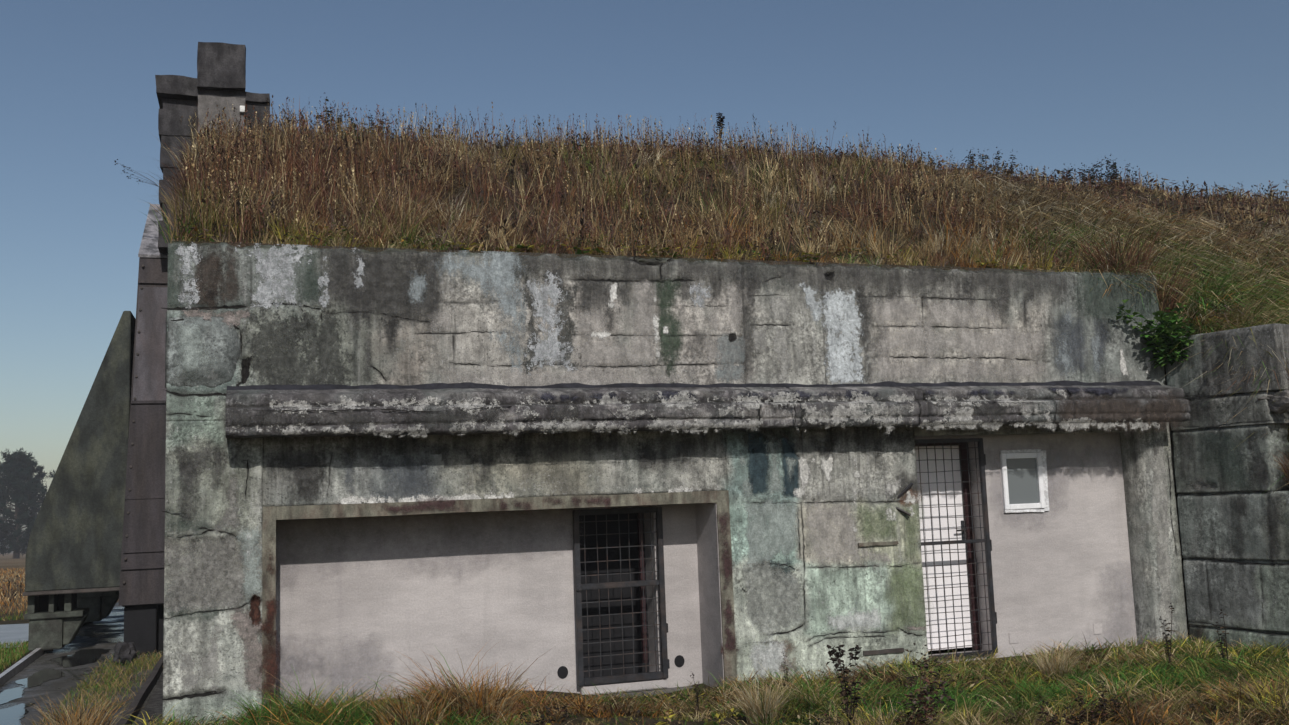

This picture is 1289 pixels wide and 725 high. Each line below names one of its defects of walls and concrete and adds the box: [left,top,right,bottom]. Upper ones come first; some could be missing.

water stain [190,245,239,306]
water stain [245,246,440,386]
water stain [516,252,1066,401]
water stain [537,391,619,420]
peeling [229,248,1175,677]
water stain [744,428,916,497]
water stain [865,476,920,553]
water stain [767,557,795,577]
corrosion [260,600,280,707]